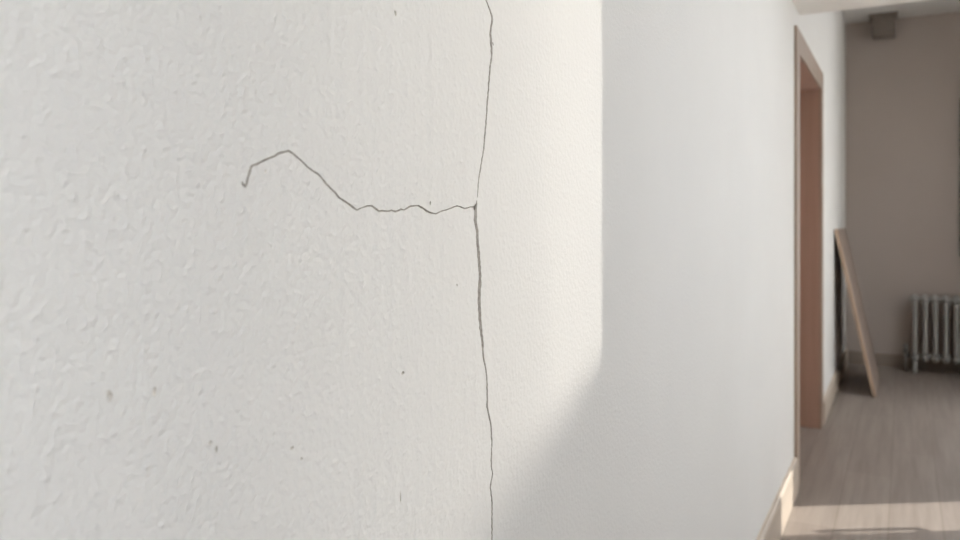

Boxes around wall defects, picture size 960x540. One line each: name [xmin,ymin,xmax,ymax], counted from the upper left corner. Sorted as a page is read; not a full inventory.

crack [242,0,494,540]